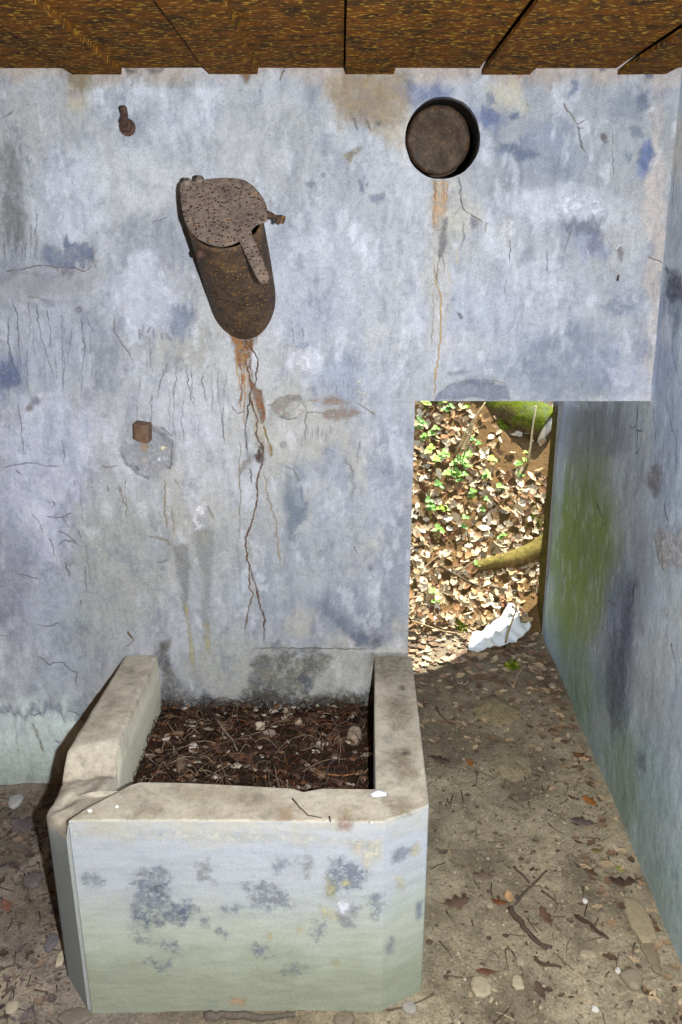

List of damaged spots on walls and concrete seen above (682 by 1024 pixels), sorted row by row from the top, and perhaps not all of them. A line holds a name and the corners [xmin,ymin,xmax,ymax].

corrosion [432,181,448,226]
corrosion [434,279,442,391]
spalling [269,395,307,433]
spalling [122,426,173,478]
corrosion [230,335,281,631]
leakage [158,642,370,709]
leakage [132,867,192,926]
leakage [248,881,286,909]
leakage [329,843,378,927]